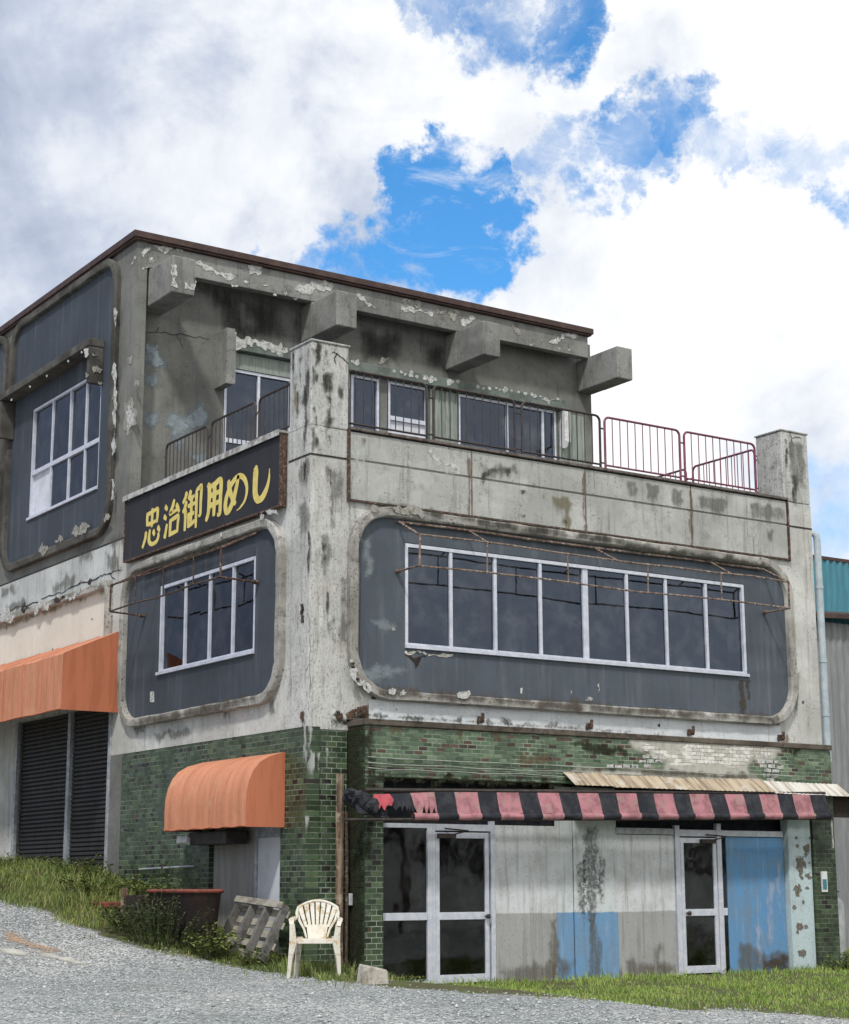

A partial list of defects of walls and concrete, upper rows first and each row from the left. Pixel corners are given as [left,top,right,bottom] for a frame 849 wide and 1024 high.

leakage [213,293,275,336]
peeling [400,298,475,327]
peeling [236,336,288,357]
peeling [81,344,209,463]
leakage [292,342,343,481]
leakage [553,497,571,528]
leakage [300,504,330,572]
crack [0,569,123,615]
peeling [350,659,374,693]
leakage [303,725,328,771]
spalling [572,734,784,789]
leakage [577,826,604,974]